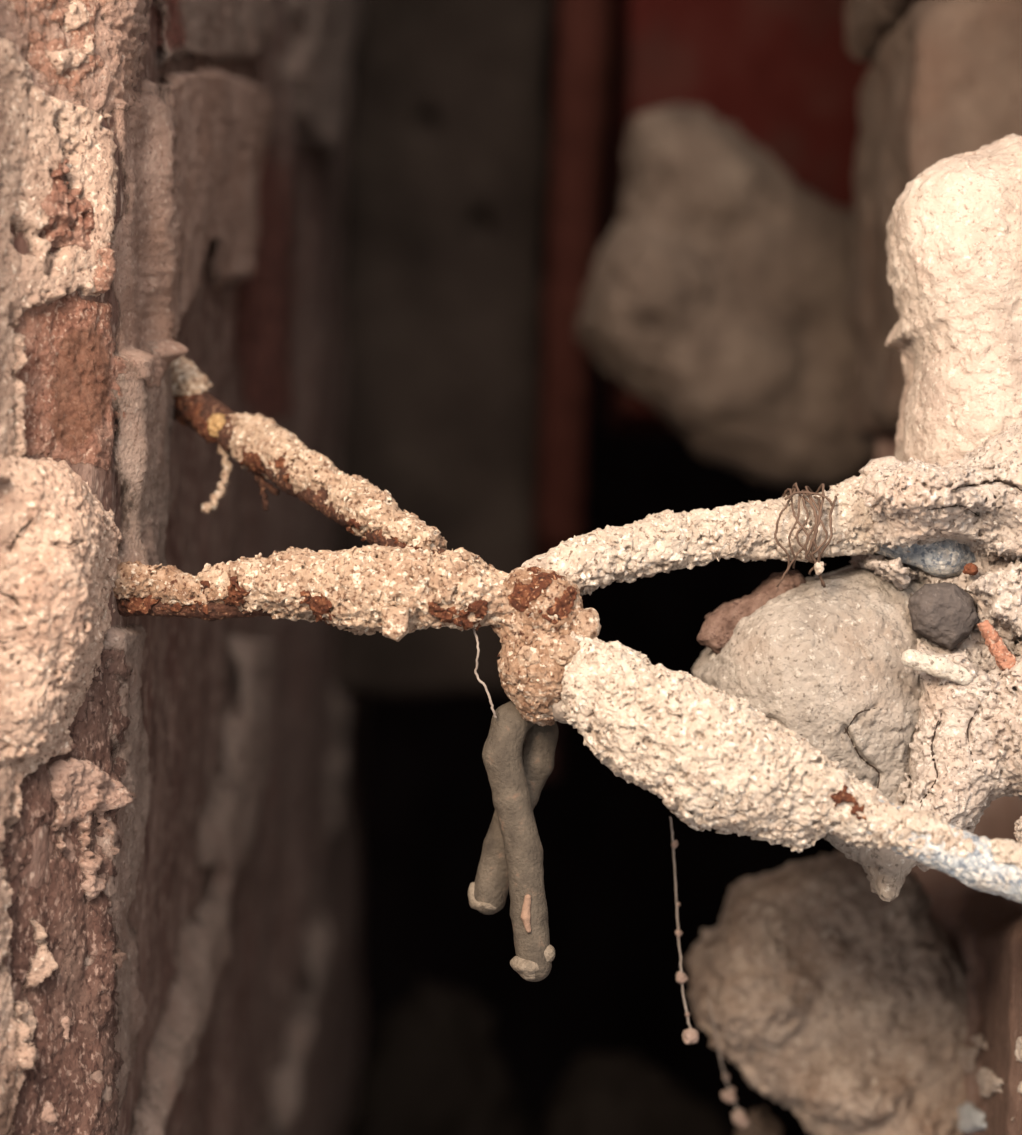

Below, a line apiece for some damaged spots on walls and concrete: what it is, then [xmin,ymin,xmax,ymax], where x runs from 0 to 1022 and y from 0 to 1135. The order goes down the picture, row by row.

corrosion [173,394,217,443]
corrosion [239,451,291,485]
crack [928,480,1022,516]
crack [5,520,31,552]
corrosion [346,518,422,550]
corrosion [119,576,251,615]
corrosion [299,590,336,625]
corrosion [427,599,488,631]
corrosion [508,566,577,624]
corrosion [830,785,867,821]
flaking render [1,648,135,1135]